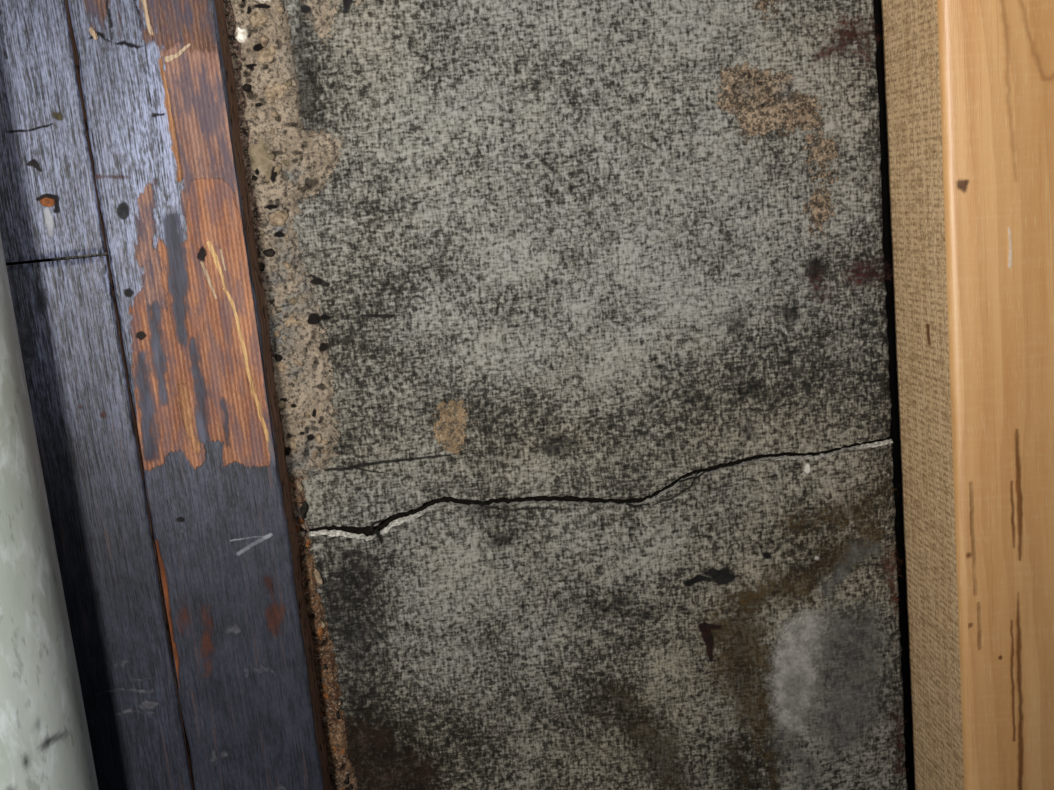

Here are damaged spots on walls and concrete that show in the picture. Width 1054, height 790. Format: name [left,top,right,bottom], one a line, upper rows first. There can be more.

crack [308,437,893,544]
leakage [684,568,734,586]
leakage [698,529,882,786]